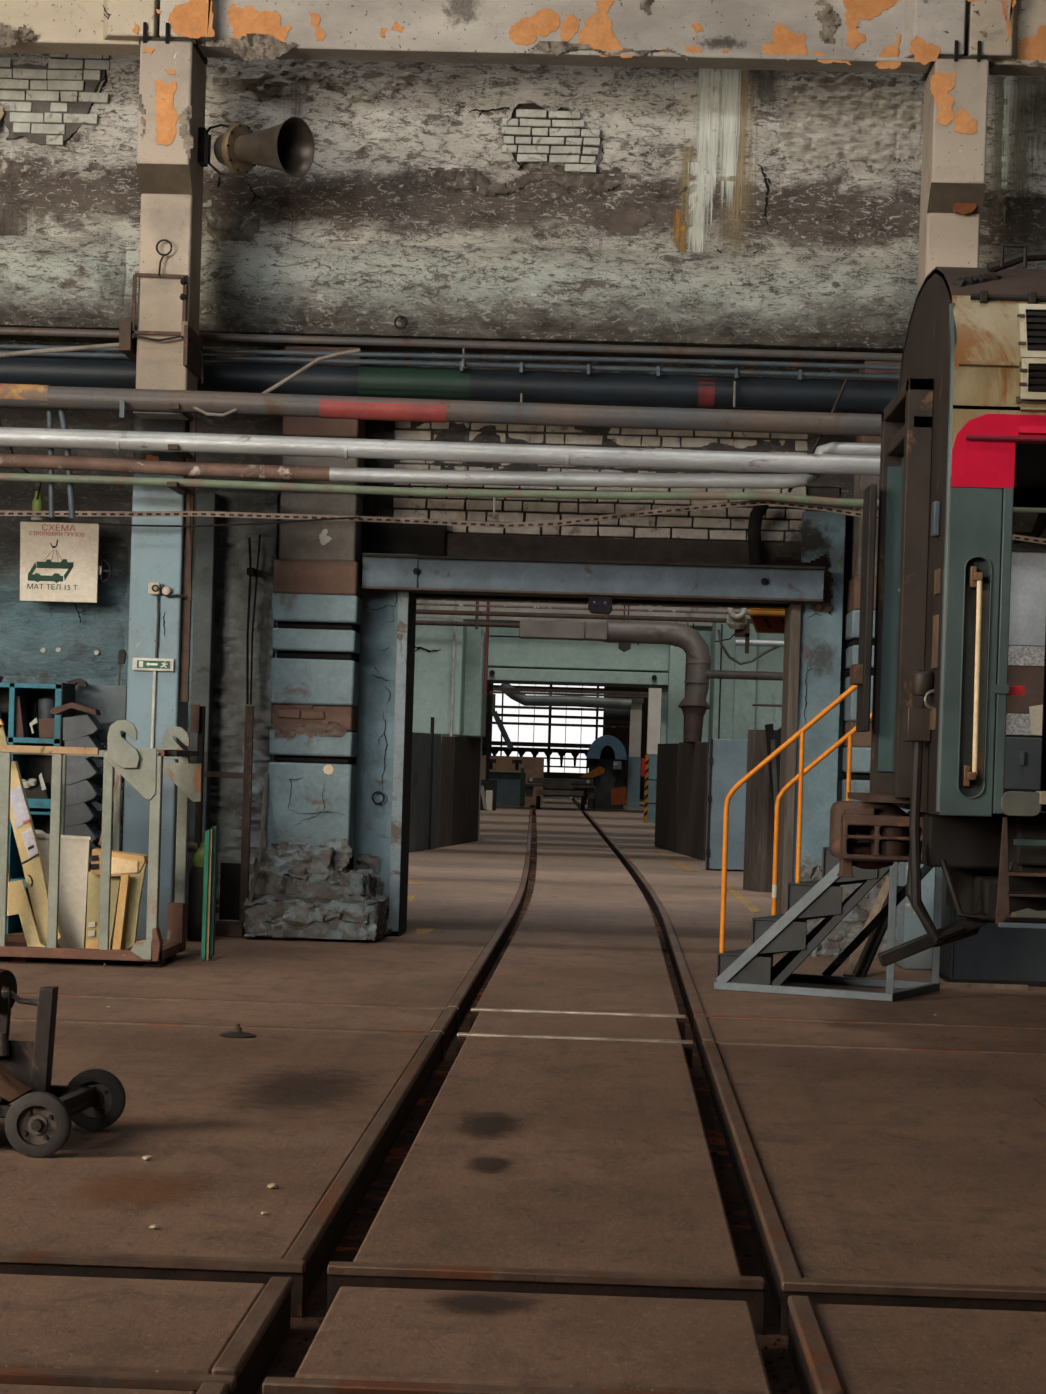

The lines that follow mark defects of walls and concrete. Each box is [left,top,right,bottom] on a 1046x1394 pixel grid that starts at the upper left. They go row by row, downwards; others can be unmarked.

flaking render [0,22,110,146]
spalling [0,157,137,179]
peeling [139,69,193,158]
spalling [156,0,436,99]
flaking render [405,100,688,196]
peeling [509,0,703,60]
leakage [681,68,776,253]
spalling [761,0,978,175]
peeling [989,0,1046,69]
spalling [601,207,656,236]
flaking render [210,492,385,921]
crack [288,777,344,825]